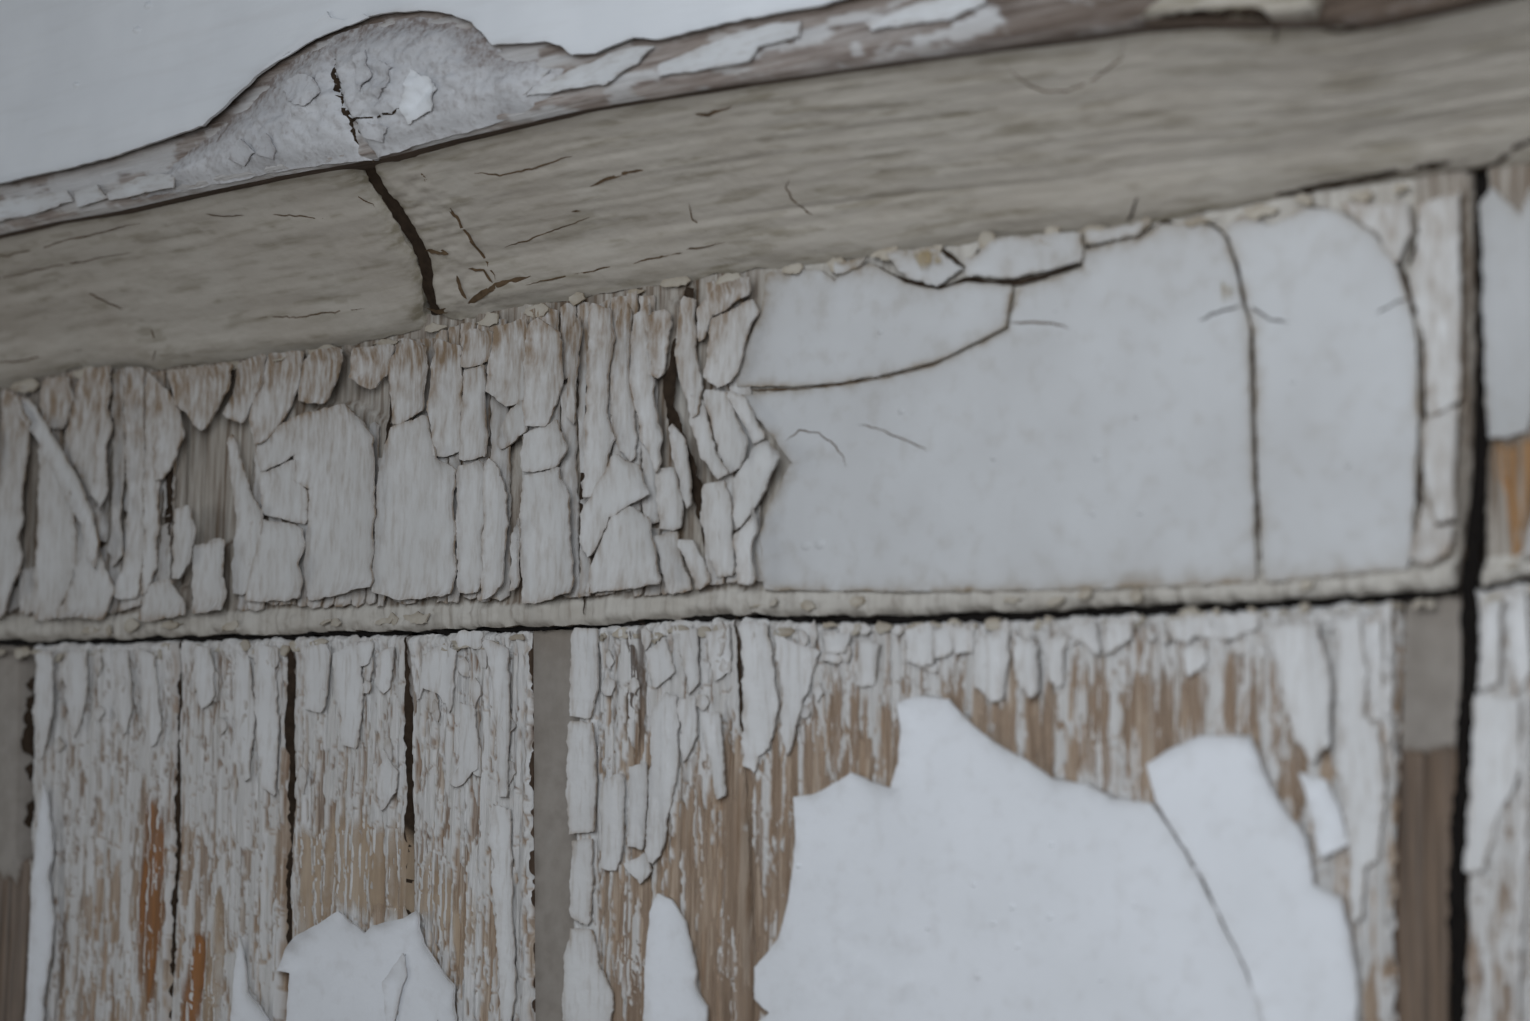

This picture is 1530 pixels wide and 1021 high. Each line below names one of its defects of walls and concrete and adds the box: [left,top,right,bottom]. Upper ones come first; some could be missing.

crack [164,466,174,574]
peeling [0,0,842,222]
crack [331,64,720,316]
crack [577,473,585,513]
crack [663,338,705,552]
peeling [0,184,1463,1021]
crack [751,244,1090,391]
peeling [865,0,987,31]
crack [1198,140,1530,574]
peeling [1479,187,1530,439]
crack [0,579,1530,1019]
peeling [1464,584,1530,1021]